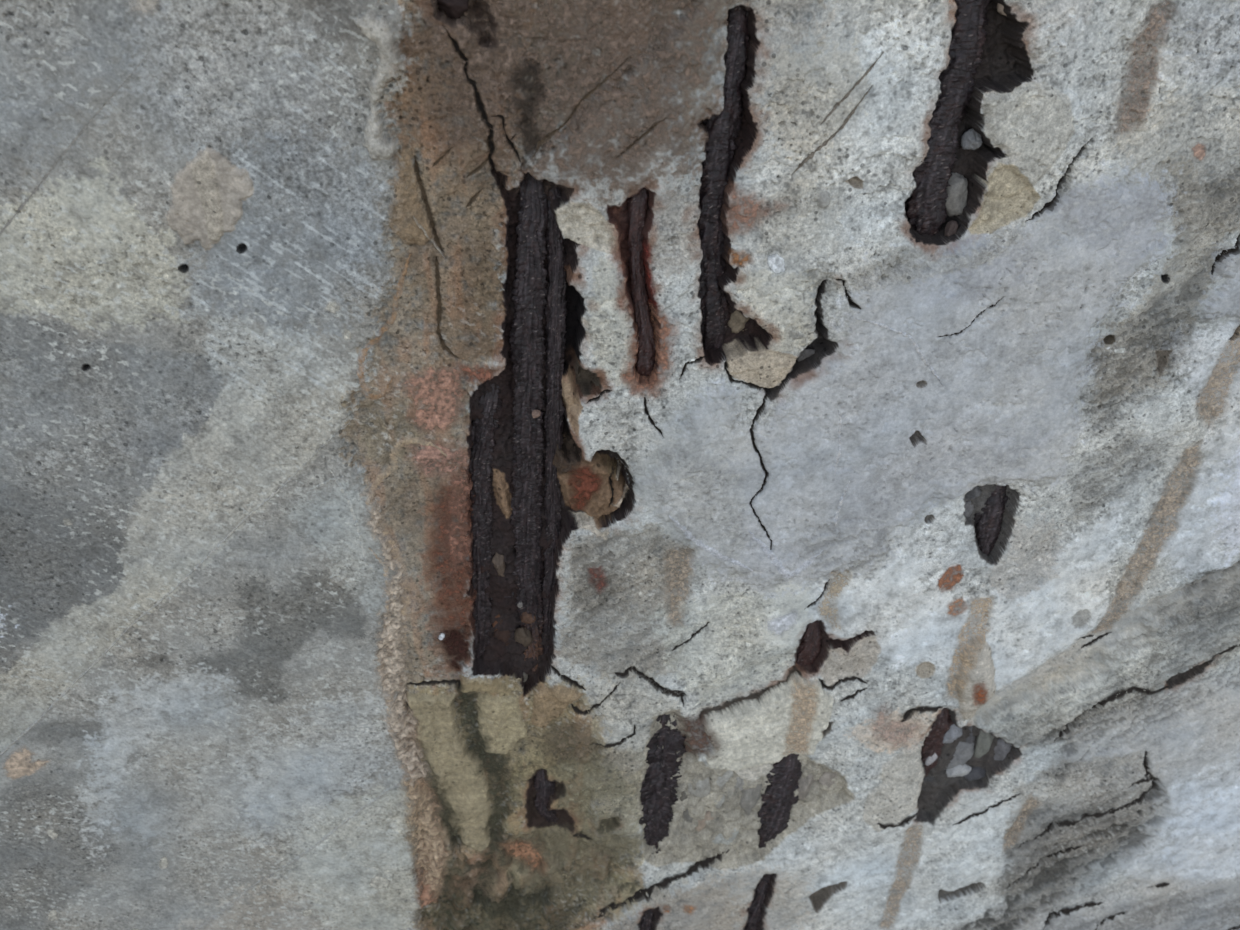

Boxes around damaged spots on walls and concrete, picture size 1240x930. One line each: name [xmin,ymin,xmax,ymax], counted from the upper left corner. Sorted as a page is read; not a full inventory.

corrosion [622,244,672,394]
crack [833,278,861,309]
crack [679,348,772,550]
peeling [406,0,1175,869]
corrosion [405,366,492,670]
crack [551,666,867,749]
crack [1054,686,1169,742]
spalling [638,907,661,930]
spalling [745,873,776,930]
spalling [808,881,848,913]
spalling [938,882,985,903]
crack [1043,902,1126,930]